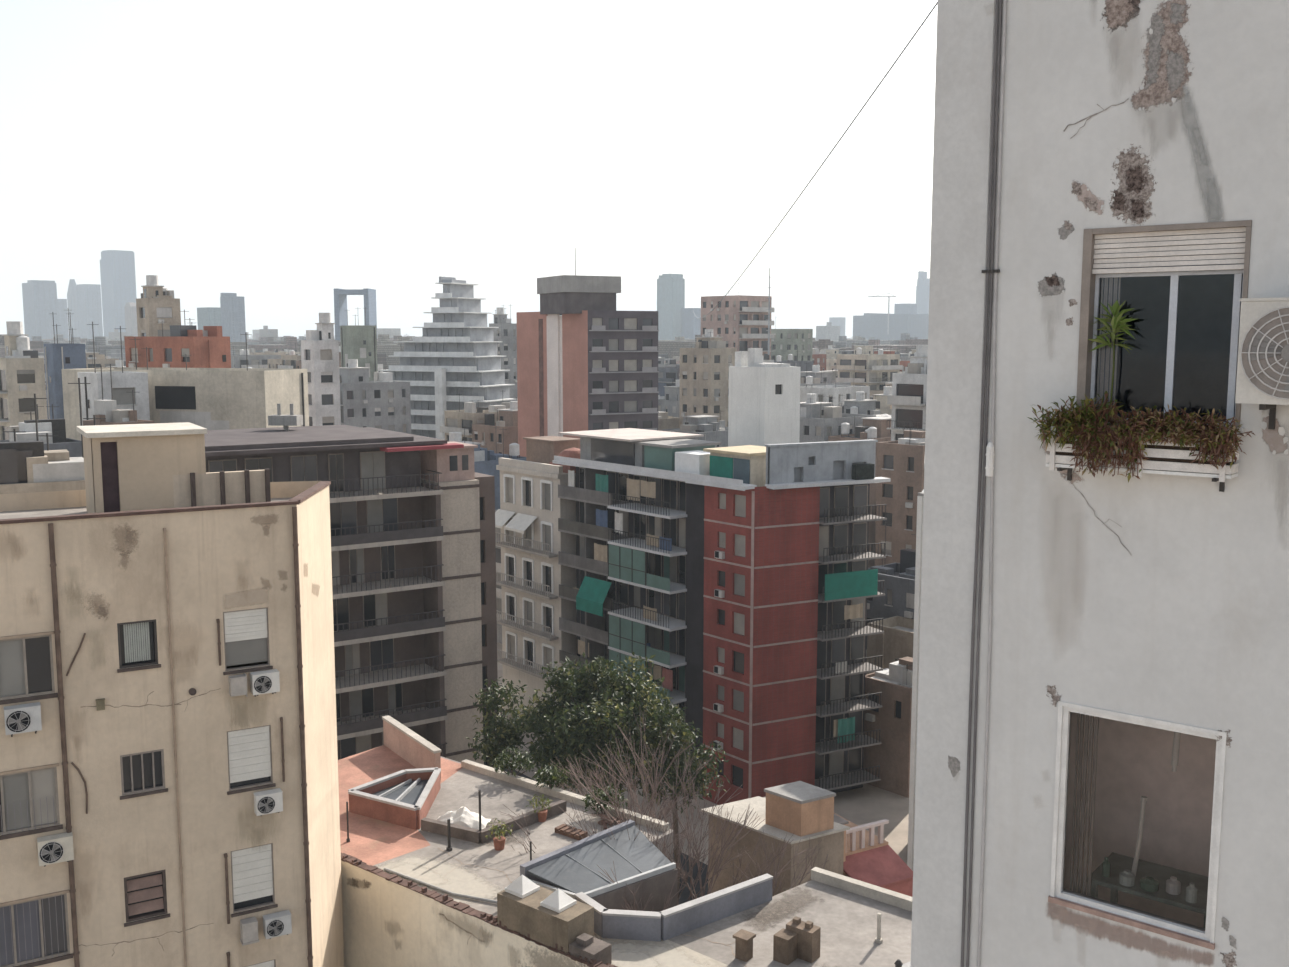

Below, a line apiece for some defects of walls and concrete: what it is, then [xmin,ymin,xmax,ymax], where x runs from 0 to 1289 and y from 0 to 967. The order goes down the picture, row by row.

flaking render [1100,0,1192,111]
crack [1064,98,1128,139]
leakage [1180,89,1222,222]
peeling [1071,144,1158,225]
peeling [1058,221,1074,240]
flaking render [1036,273,1078,326]
crack [81,688,221,710]
flaking render [1045,685,1061,706]
flaking render [948,756,960,777]